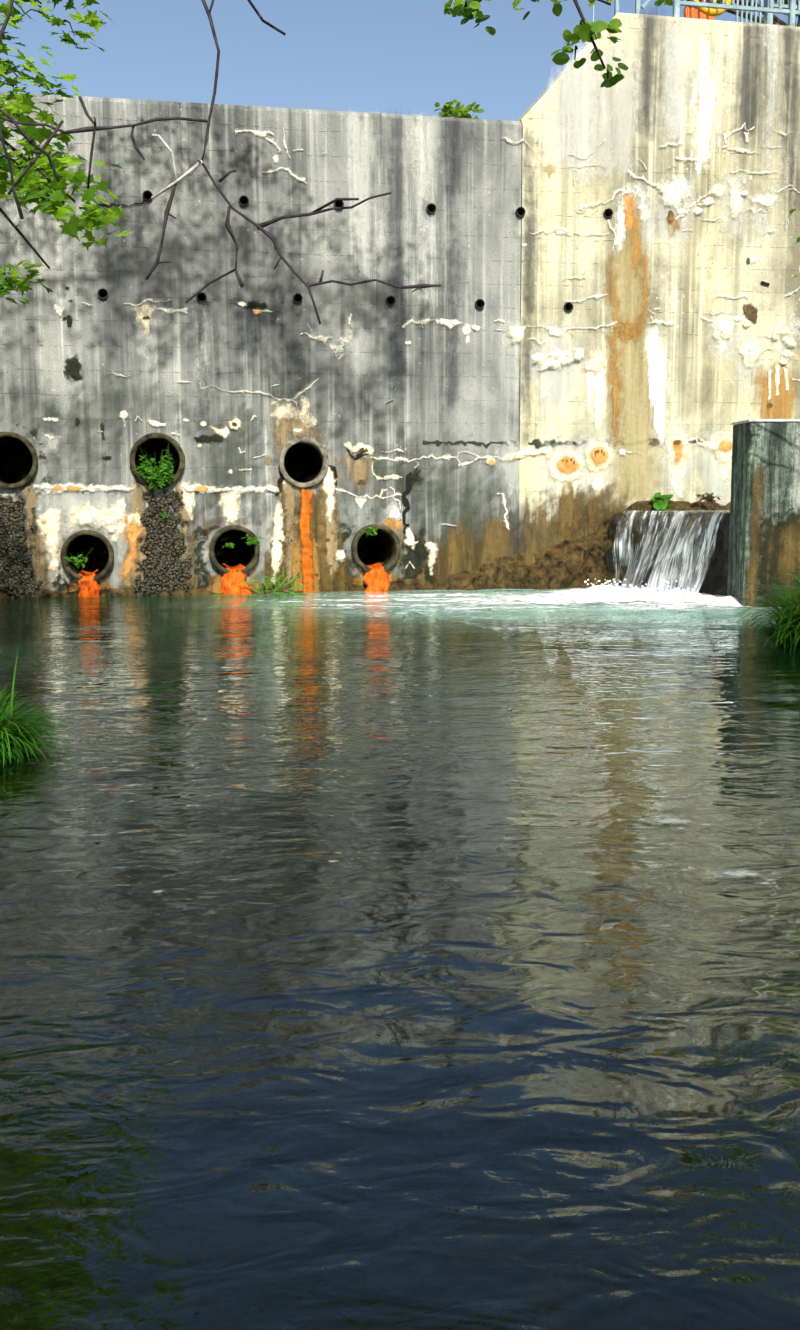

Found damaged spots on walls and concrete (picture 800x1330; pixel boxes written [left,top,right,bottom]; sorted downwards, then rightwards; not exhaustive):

rust [608,193,654,500]
rust [756,363,800,419]
spalling [120,399,316,447]
damp [554,483,614,535]
rust [291,489,319,592]